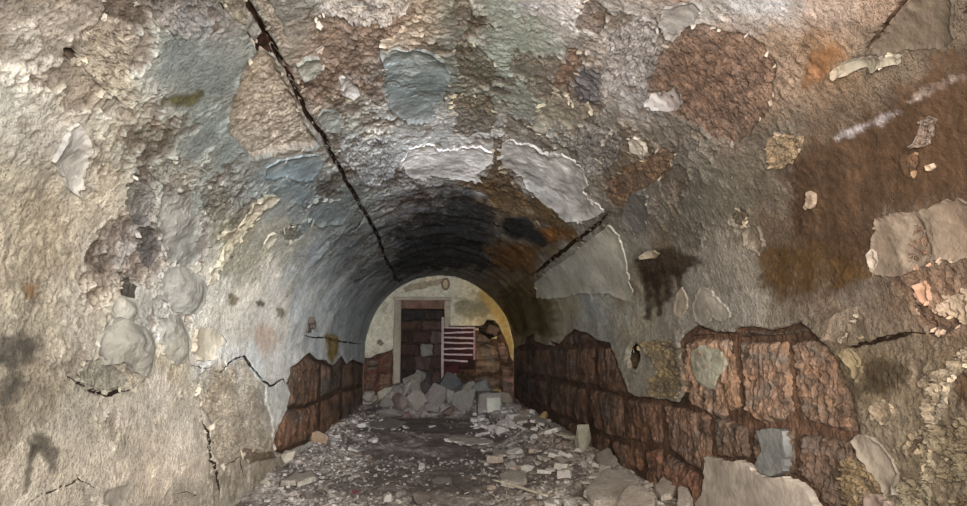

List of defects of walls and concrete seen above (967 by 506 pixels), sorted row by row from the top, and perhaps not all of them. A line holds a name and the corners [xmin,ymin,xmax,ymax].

crack [219,0,396,281]
spalling [223,0,416,163]
peeling [336,127,403,187]
peeling [448,40,562,227]
spalling [575,0,777,148]
crack [866,0,908,48]
crack [534,212,610,274]
water stain [635,249,697,319]
water stain [0,338,34,400]
water stain [25,435,58,492]
flaking render [191,327,393,471]
flaking render [457,322,866,506]